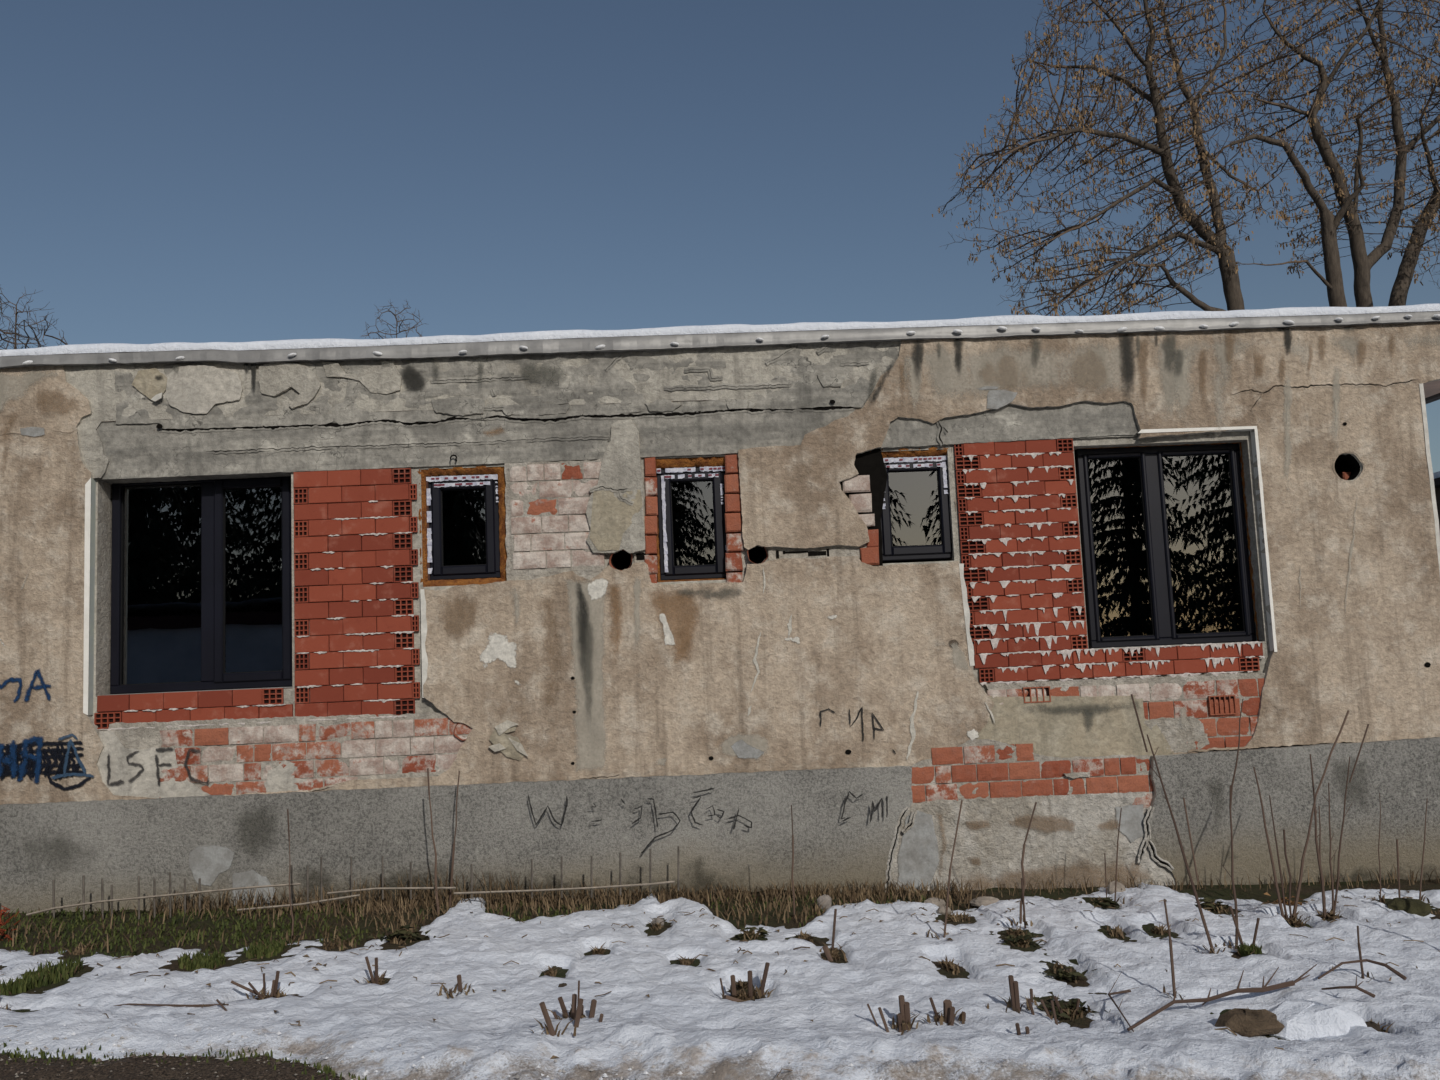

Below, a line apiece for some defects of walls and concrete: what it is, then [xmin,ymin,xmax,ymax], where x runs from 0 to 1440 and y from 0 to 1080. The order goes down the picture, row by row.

crack [159,345,869,454]
damp [870,334,1243,420]
damp [1277,327,1305,352]
spalling [114,341,900,581]
damp [567,578,608,769]
spalling [97,712,473,798]
spalling [890,673,1266,891]
crack [1137,806,1174,872]